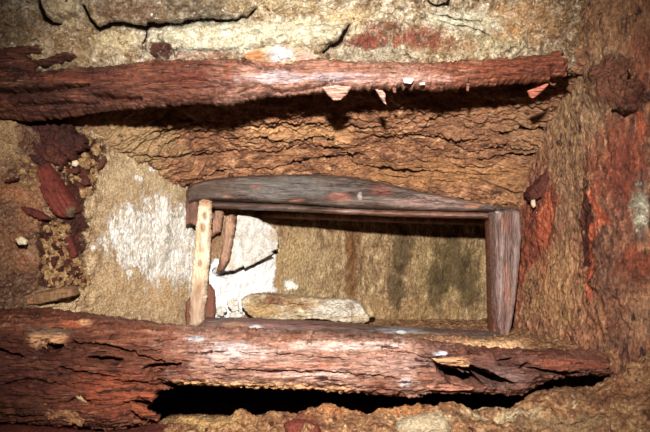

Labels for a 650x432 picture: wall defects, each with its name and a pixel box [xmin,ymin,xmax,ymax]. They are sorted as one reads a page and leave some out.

crack [39,0,62,26]
crack [82,4,257,44]
crack [322,24,350,54]
leakage [90,190,196,296]
leakage [388,229,414,310]